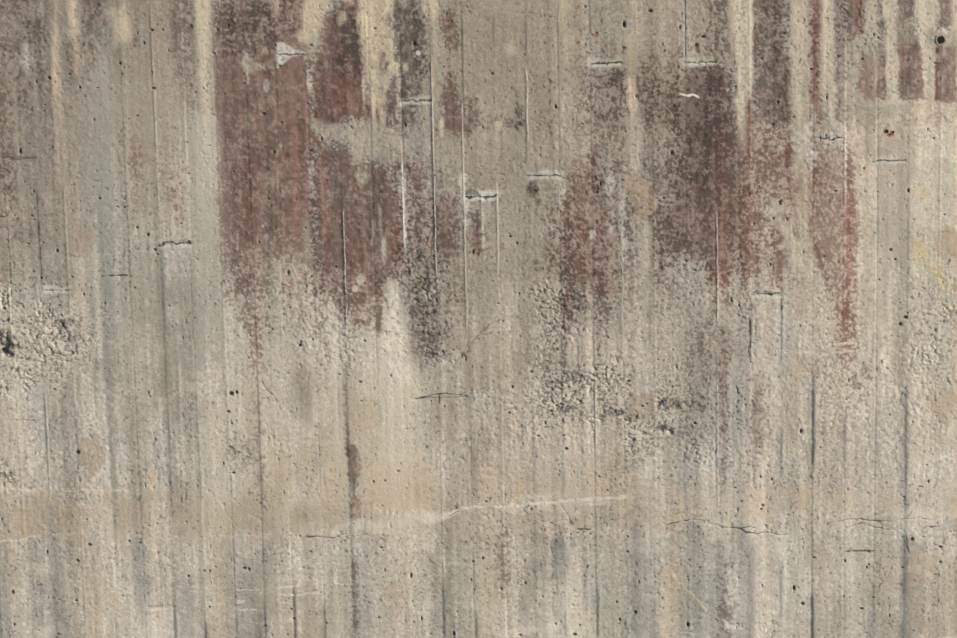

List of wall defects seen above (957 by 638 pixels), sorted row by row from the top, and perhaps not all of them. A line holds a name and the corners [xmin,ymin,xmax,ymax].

rust [934,45,945,87]
crack [541,504,592,531]
crack [664,515,790,535]